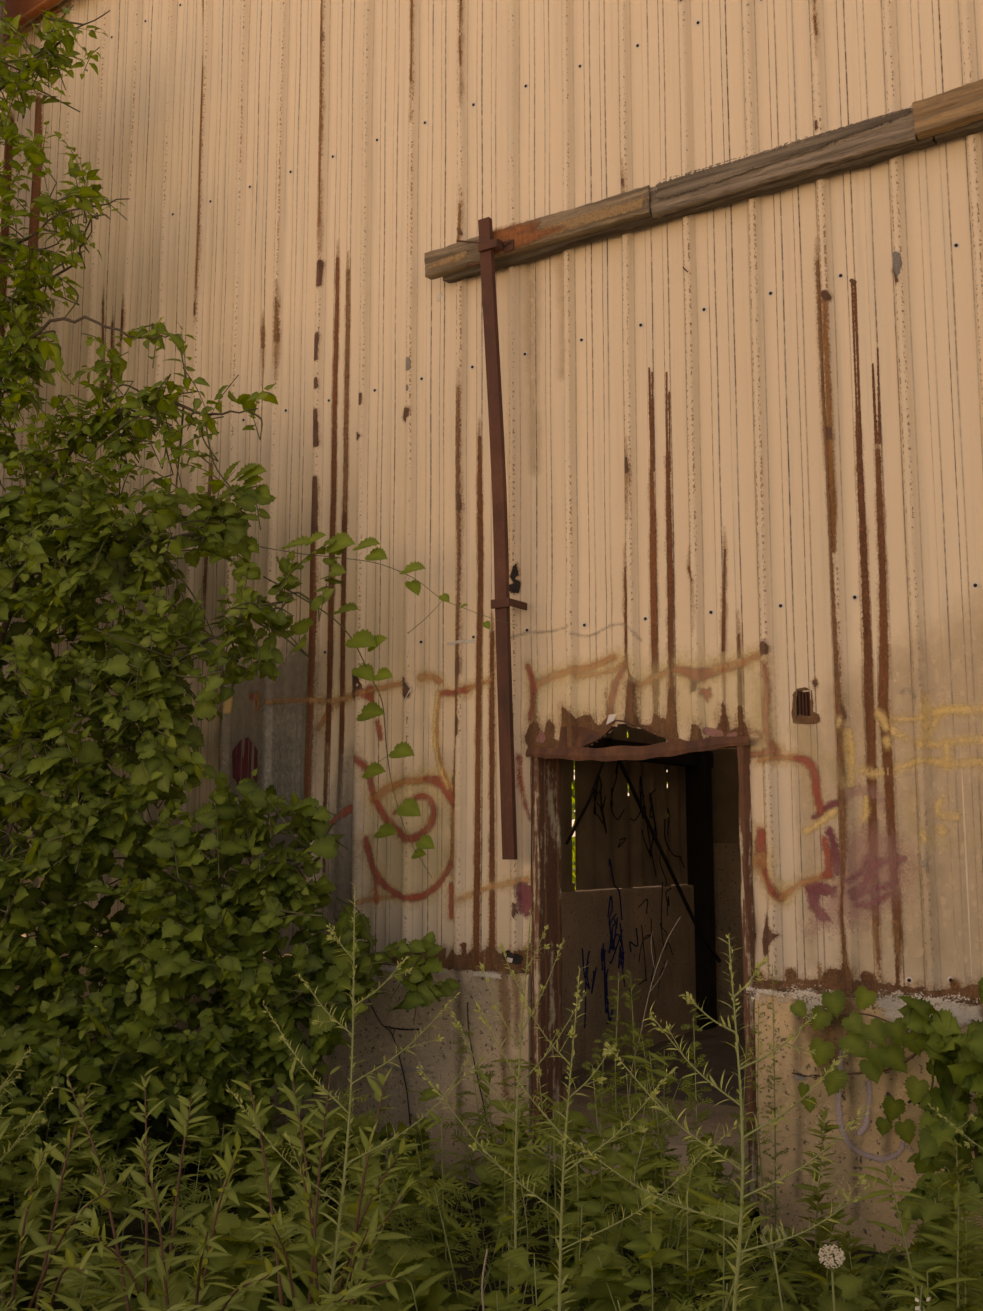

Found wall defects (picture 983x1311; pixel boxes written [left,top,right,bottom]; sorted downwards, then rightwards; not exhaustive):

rust [304,0,350,813]
rust [382,387,531,1097]
rust [525,367,751,764]
rust [755,260,983,1070]